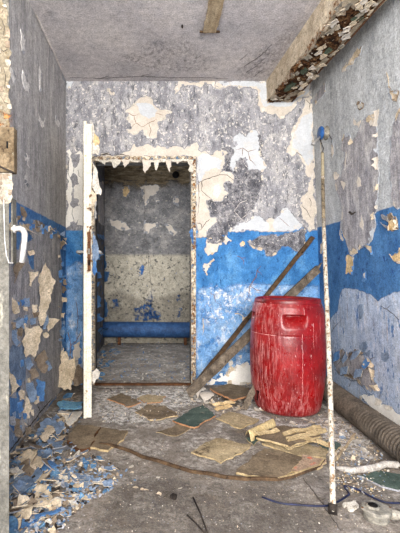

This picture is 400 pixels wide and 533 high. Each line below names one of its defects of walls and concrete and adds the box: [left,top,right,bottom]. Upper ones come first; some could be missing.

peeling [0,149,83,461]
peeling [92,0,385,335]
peeling [331,108,400,276]
peeling [333,348,400,426]